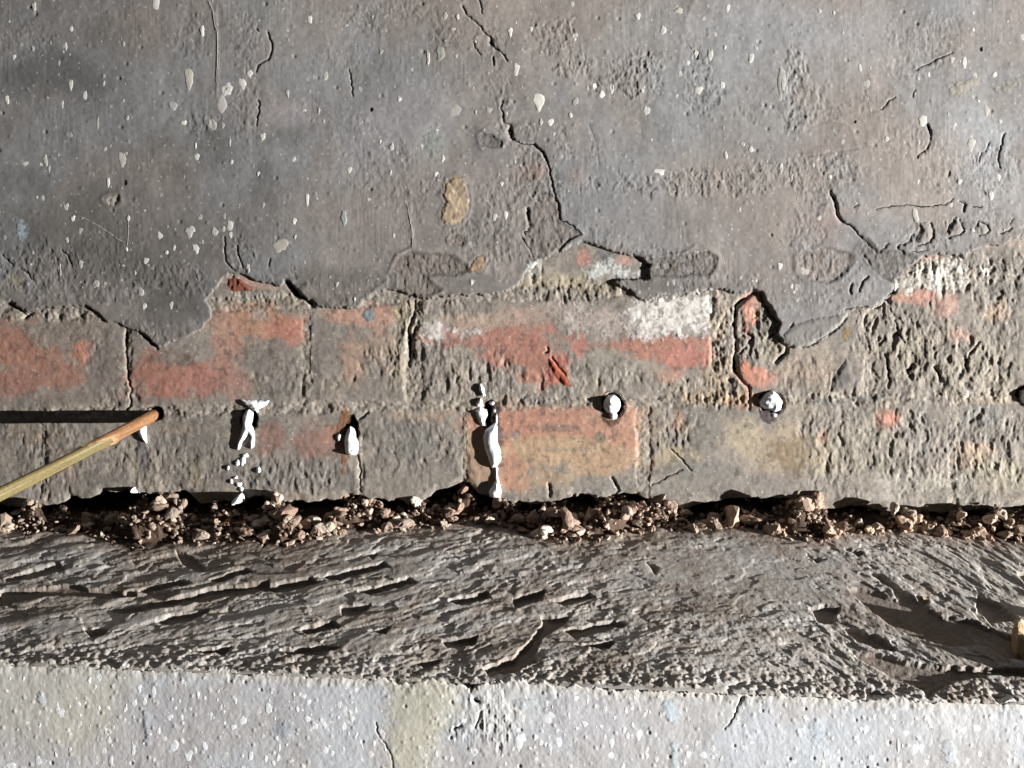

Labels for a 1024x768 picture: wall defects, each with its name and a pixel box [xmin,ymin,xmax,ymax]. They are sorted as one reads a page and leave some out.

crack [462,1,506,65]
crack [523,209,532,254]
crack [500,101,581,240]
spalling [0,175,1024,514]
efflorescence [556,288,714,342]
crack [732,195,1014,410]